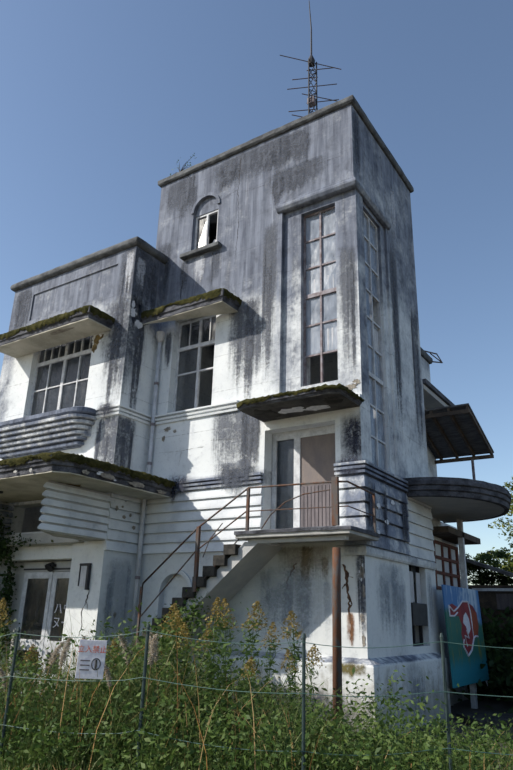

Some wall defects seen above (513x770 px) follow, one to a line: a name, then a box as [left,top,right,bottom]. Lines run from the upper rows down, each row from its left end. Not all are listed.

water stain [217,129,323,202]
water stain [94,244,171,469]
spalling [131,300,143,329]
water stain [180,250,220,289]
water stain [229,225,277,393]
water stain [340,250,357,354]
water stain [213,407,282,492]